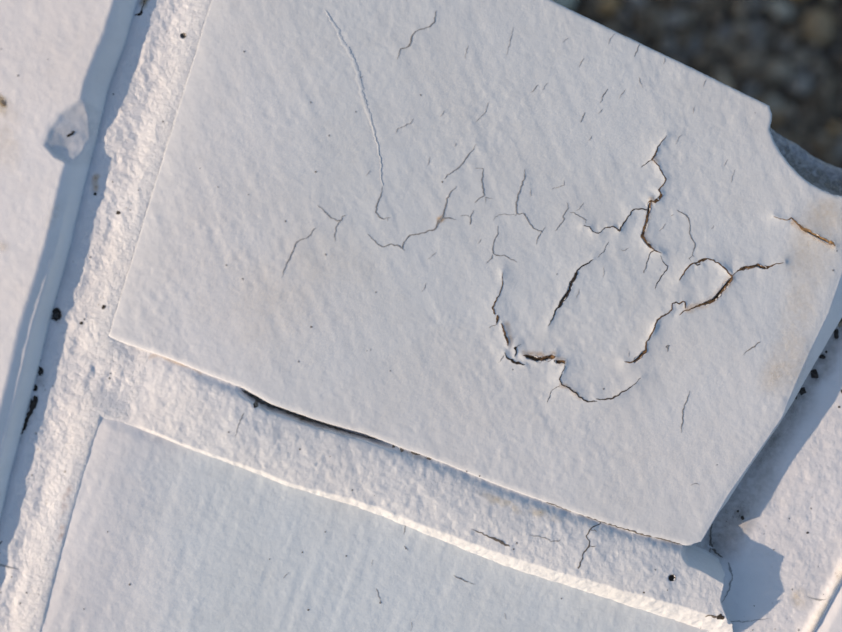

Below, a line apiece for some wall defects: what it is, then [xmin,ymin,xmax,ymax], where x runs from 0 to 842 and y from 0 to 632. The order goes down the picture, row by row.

crack [282,204,345,277]
crack [371,135,781,402]
crack [775,217,835,246]
crack [546,502,679,569]